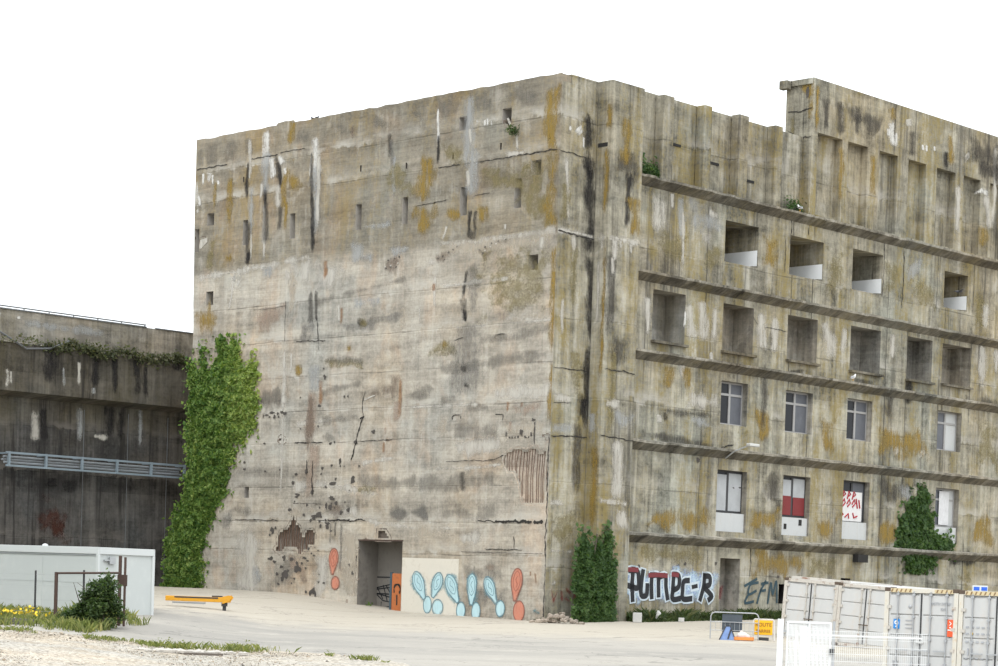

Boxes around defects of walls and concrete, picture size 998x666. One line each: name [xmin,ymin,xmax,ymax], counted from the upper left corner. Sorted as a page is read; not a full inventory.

damp [200,132,321,308]
damp [442,114,638,337]
damp [653,194,719,263]
damp [684,302,717,338]
crack [555,367,635,375]
spalling [267,458,350,585]
crack [351,393,392,460]
spalling [502,418,550,506]
damp [496,351,594,486]
crack [478,435,633,617]
damp [601,442,627,527]
damp [655,393,717,446]